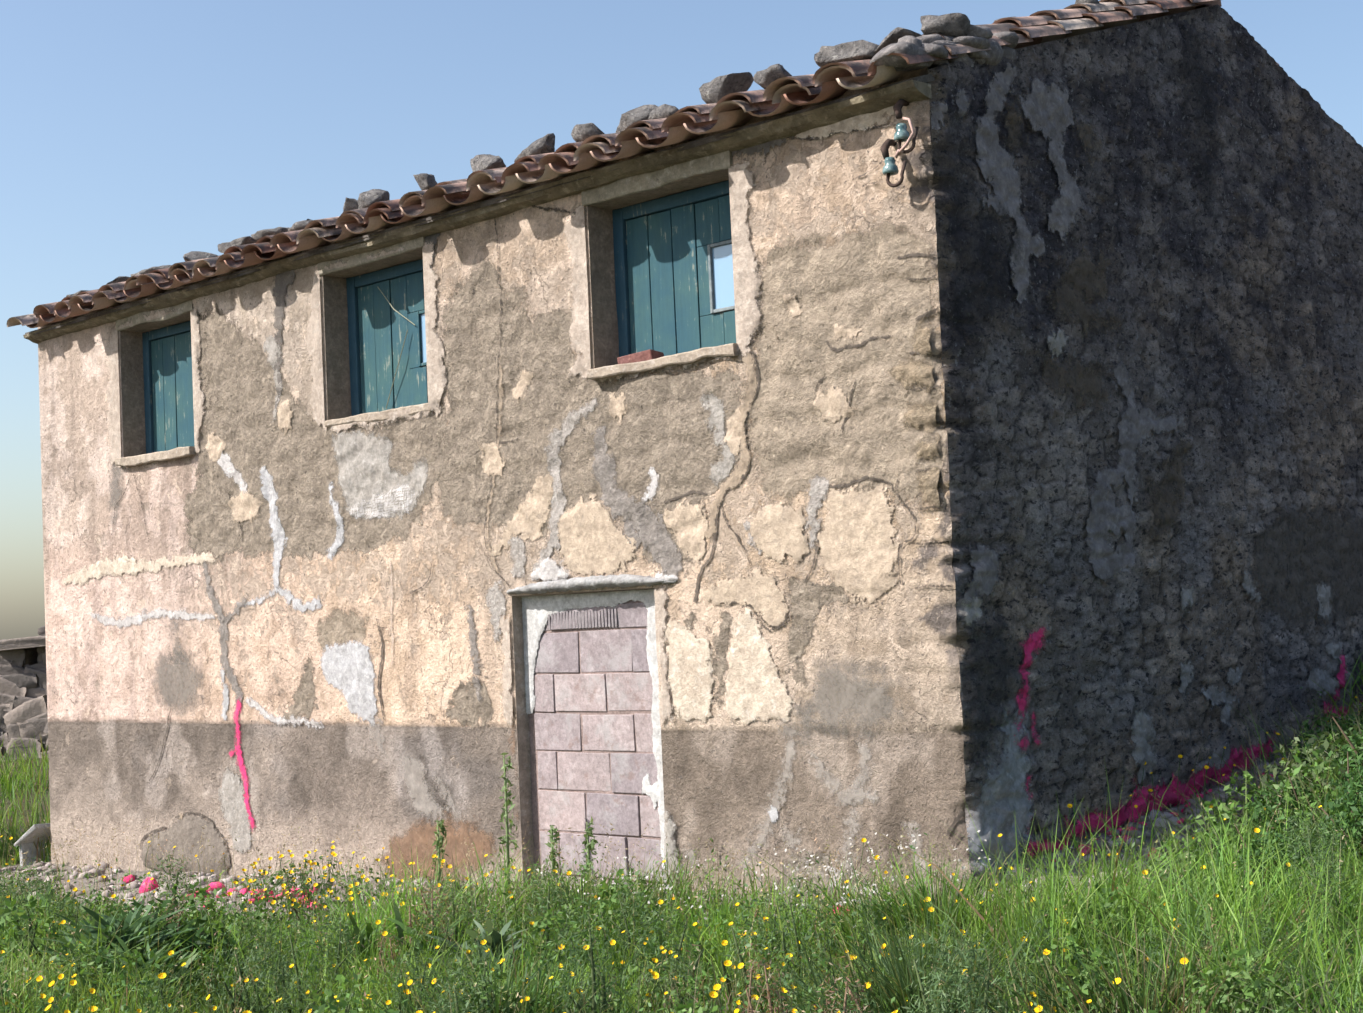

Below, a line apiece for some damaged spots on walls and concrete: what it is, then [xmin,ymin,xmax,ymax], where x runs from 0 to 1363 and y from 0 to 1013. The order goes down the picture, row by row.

crack [91,451,324,730]
crack [326,482,344,560]
flaking render [63,219,947,725]
crack [484,220,761,602]
crack [729,468,952,632]
crack [815,253,941,433]
leakage [1316,583,1333,619]
leakage [400,753,461,820]
flaking render [443,675,493,734]
leakage [741,661,893,869]
leakage [1131,707,1158,804]
leakage [1178,659,1243,774]